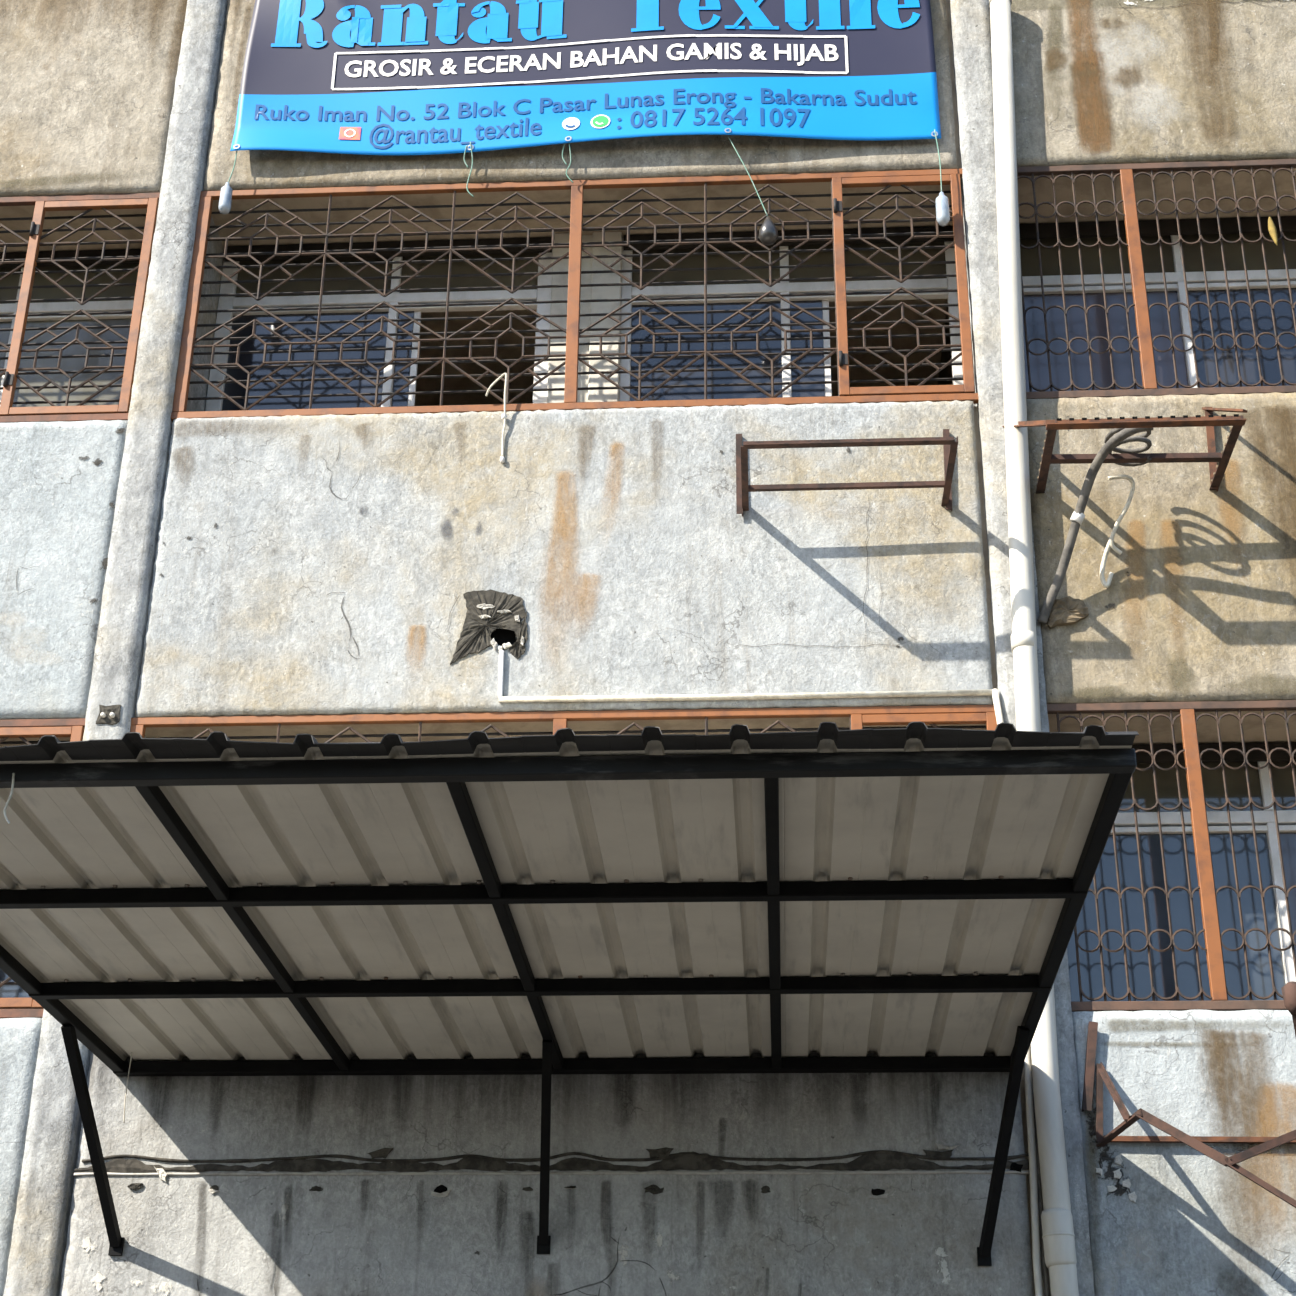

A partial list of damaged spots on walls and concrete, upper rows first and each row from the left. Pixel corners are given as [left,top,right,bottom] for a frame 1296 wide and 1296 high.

water stain [171,0,187,67]
corrosion [1070,0,1110,151]
corrosion [1204,1030,1296,1193]
crack [557,1239,667,1296]